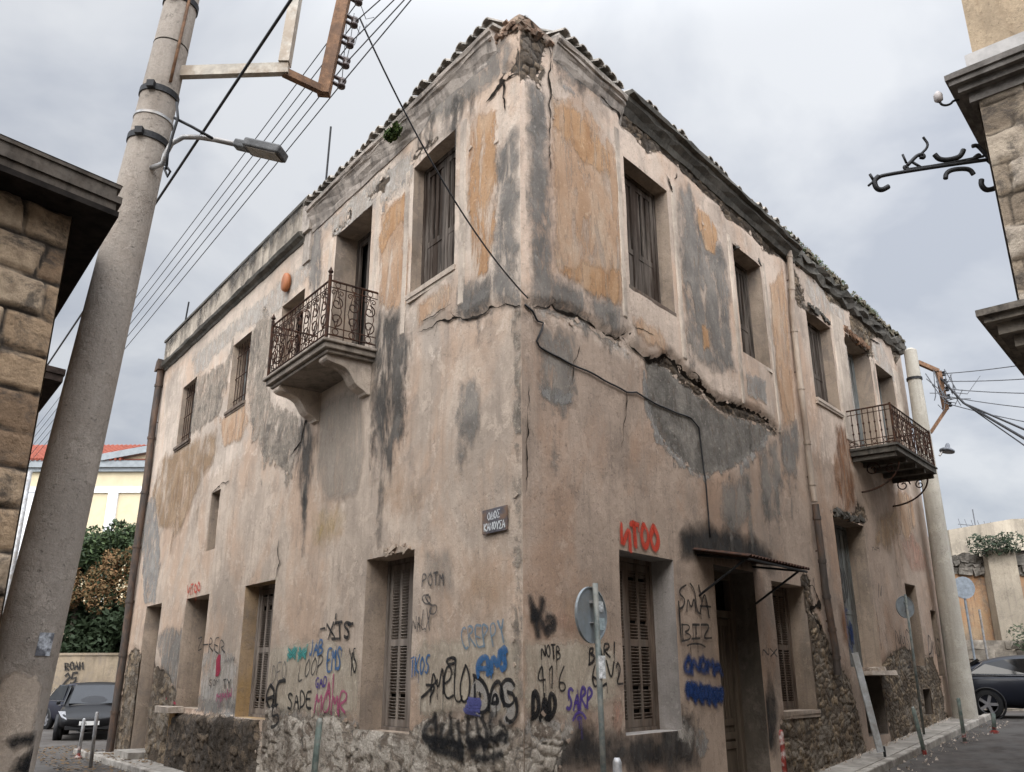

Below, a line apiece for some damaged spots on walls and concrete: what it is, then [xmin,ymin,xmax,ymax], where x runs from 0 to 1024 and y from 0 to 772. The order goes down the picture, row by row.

peeling [467,110,498,276]
crack [486,73,517,109]
spalling [488,15,555,89]
water stain [457,83,620,332]
crack [548,46,557,181]
peeling [552,85,626,305]
water stain [297,419,313,529]
water stain [372,313,407,473]
water stain [457,381,479,463]
crack [417,299,776,433]
spalling [621,116,900,481]
spalling [780,573,866,772]